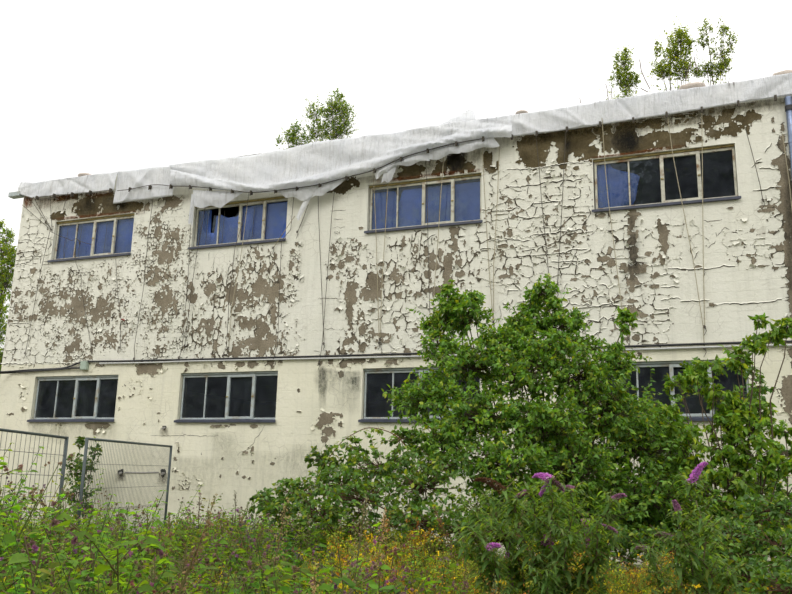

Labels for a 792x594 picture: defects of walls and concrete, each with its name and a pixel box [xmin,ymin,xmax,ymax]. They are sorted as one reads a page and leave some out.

crack [751,143,781,191]
crack [13,211,58,289]
peeling [7,189,306,411]
peeling [317,226,483,378]
crack [474,159,620,335]
peeling [512,107,792,358]
crack [661,219,782,305]
crack [1,319,77,376]
peeling [772,346,792,425]
peeling [84,422,112,438]
peeling [310,408,344,457]